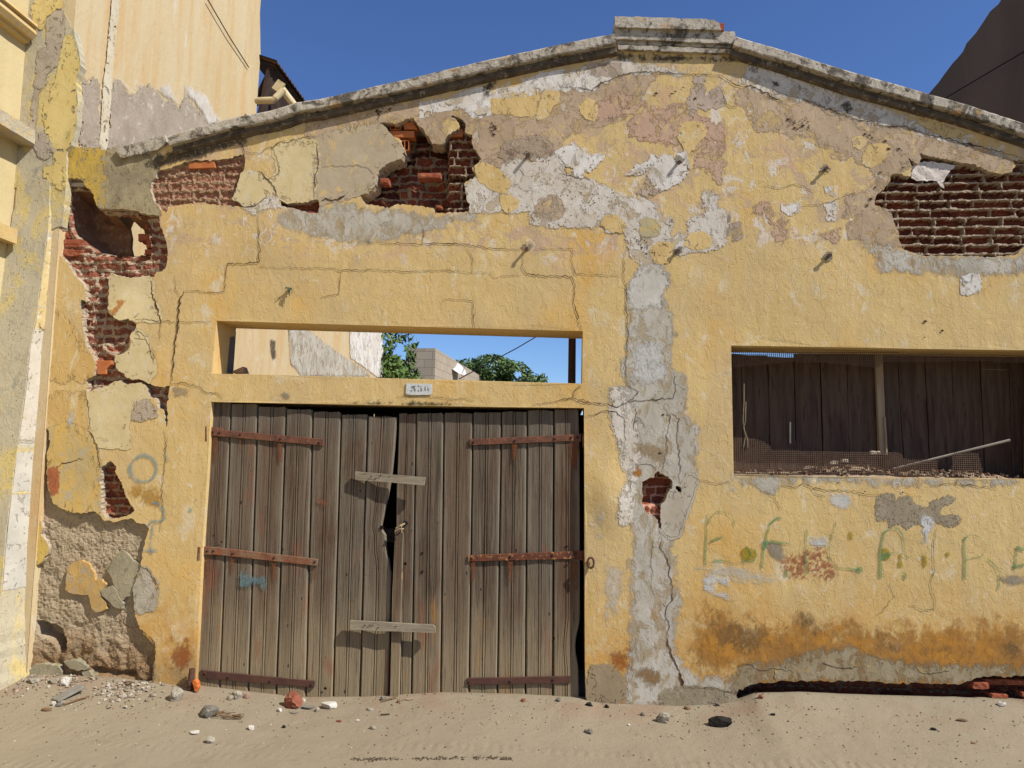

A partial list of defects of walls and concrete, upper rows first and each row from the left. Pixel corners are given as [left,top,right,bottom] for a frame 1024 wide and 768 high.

peeling [44,58,1024,432]
crack [136,136,737,697]
peeling [608,386,680,529]
flaking render [31,463,159,681]
peeling [731,643,1024,699]